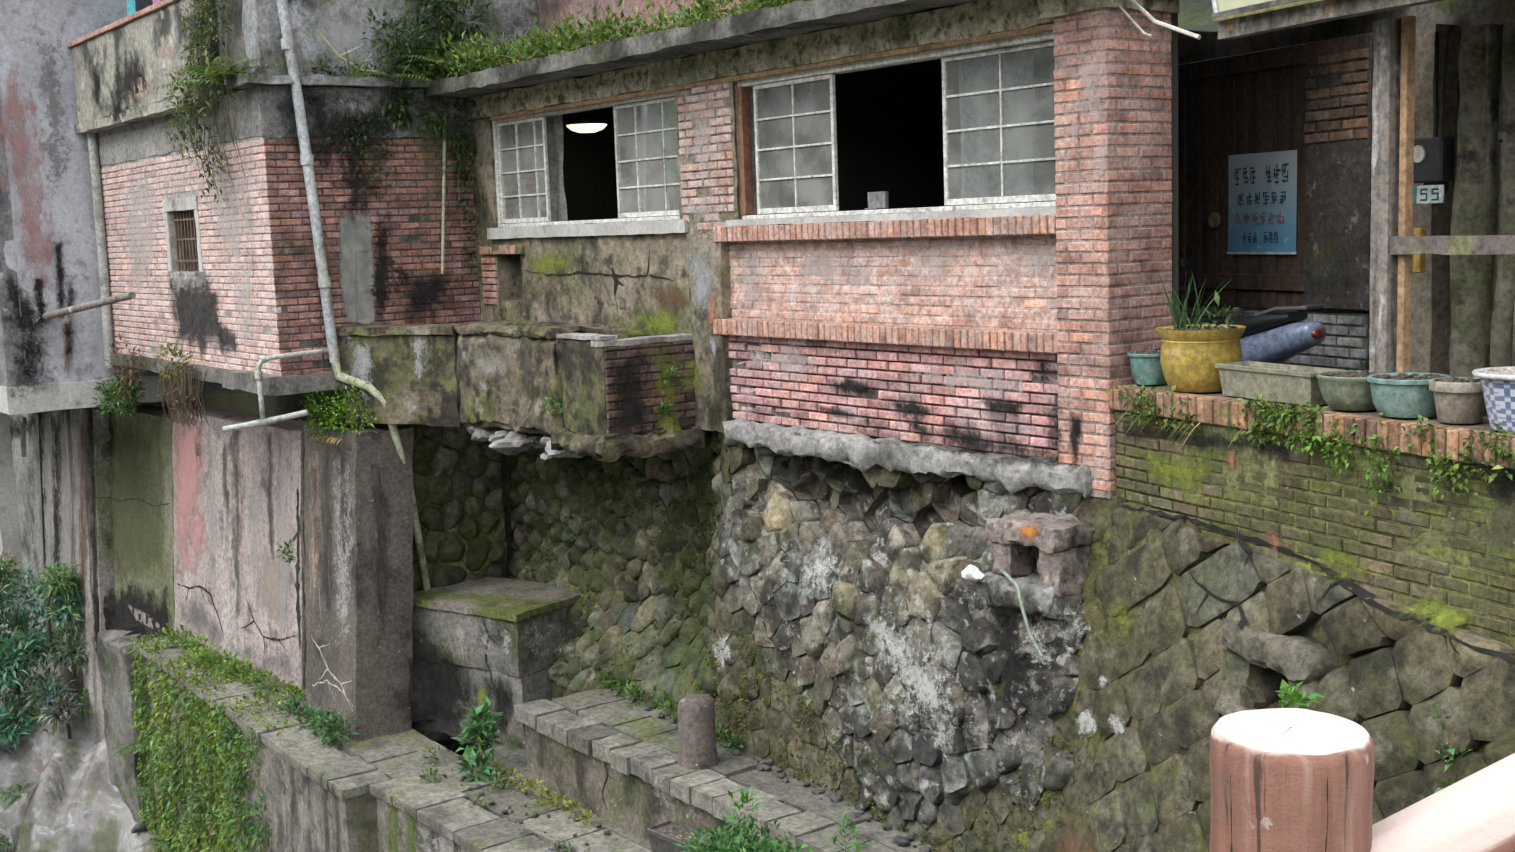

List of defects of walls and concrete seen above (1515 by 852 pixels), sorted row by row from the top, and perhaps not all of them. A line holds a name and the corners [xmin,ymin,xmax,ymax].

leakage [89,49,146,127]
leakage [2,243,76,397]
crack [524,250,674,320]
leakage [9,412,62,583]
leakage [87,407,217,652]
crack [177,489,355,711]